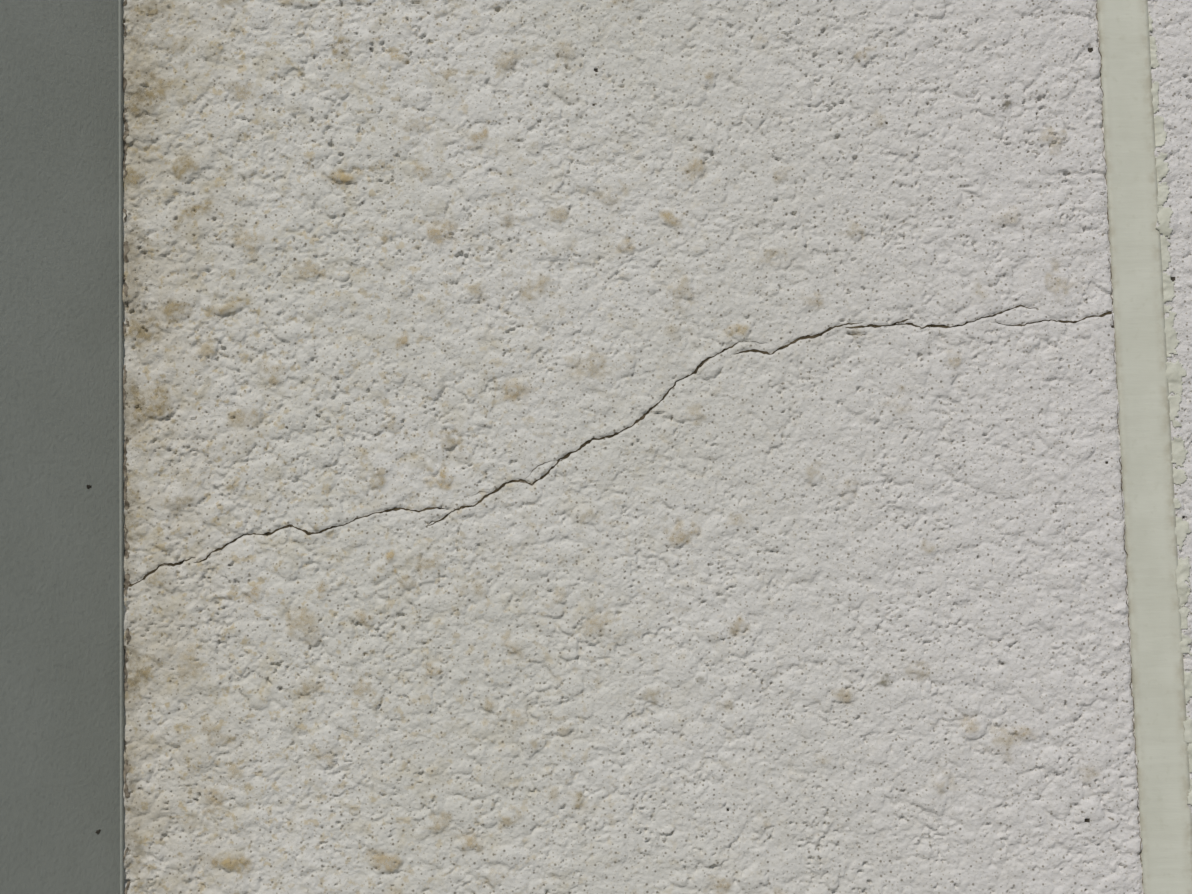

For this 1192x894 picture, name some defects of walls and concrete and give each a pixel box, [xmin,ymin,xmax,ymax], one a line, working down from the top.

crack [123,305,1114,588]